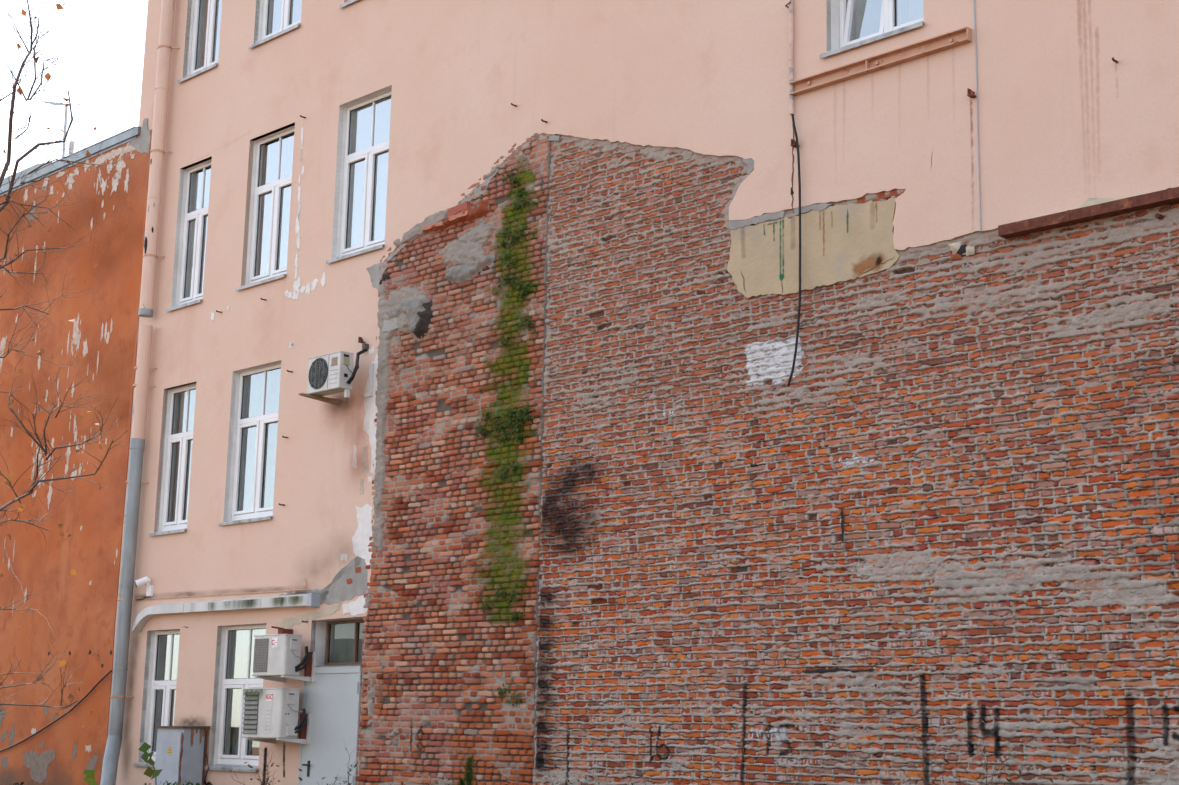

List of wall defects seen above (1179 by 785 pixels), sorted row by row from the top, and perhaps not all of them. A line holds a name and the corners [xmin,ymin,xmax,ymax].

flaking render [23,118,152,230]
peeling [285,123,326,300]
spalling [421,199,493,232]
spalling [382,298,433,339]
peeling [31,313,113,522]
flaking render [275,346,378,629]